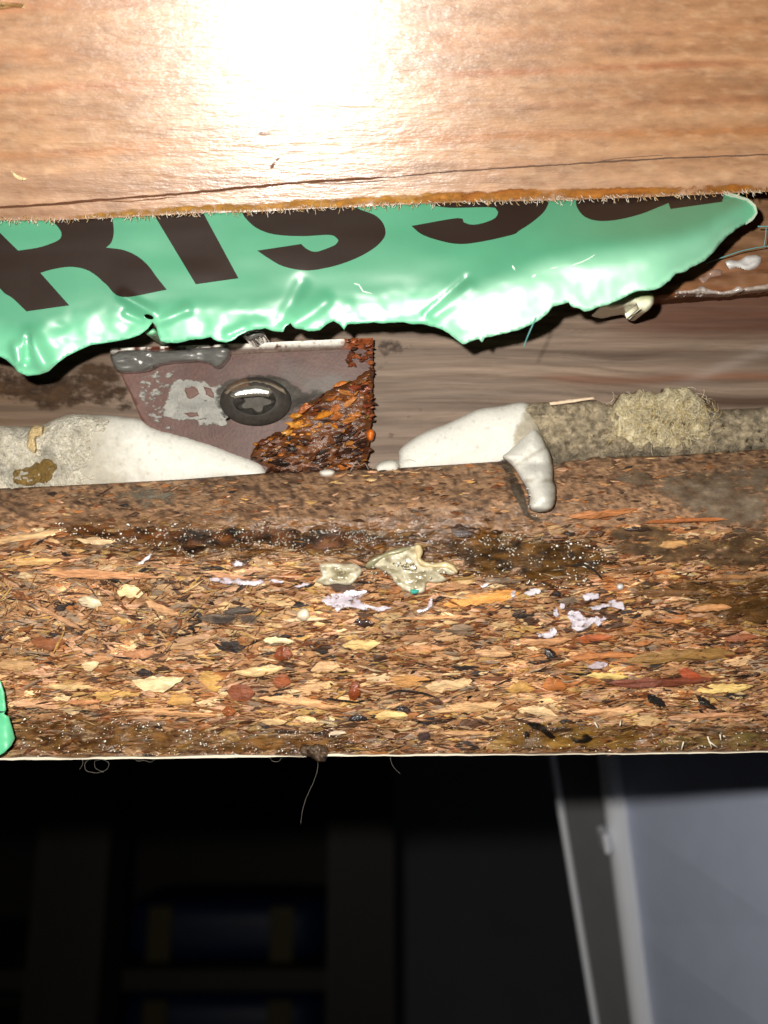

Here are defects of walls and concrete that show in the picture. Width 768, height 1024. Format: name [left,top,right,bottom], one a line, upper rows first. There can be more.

crack [0,154,768,209]
rust [250,338,377,473]
leakage [78,525,360,555]
leakage [442,541,604,582]